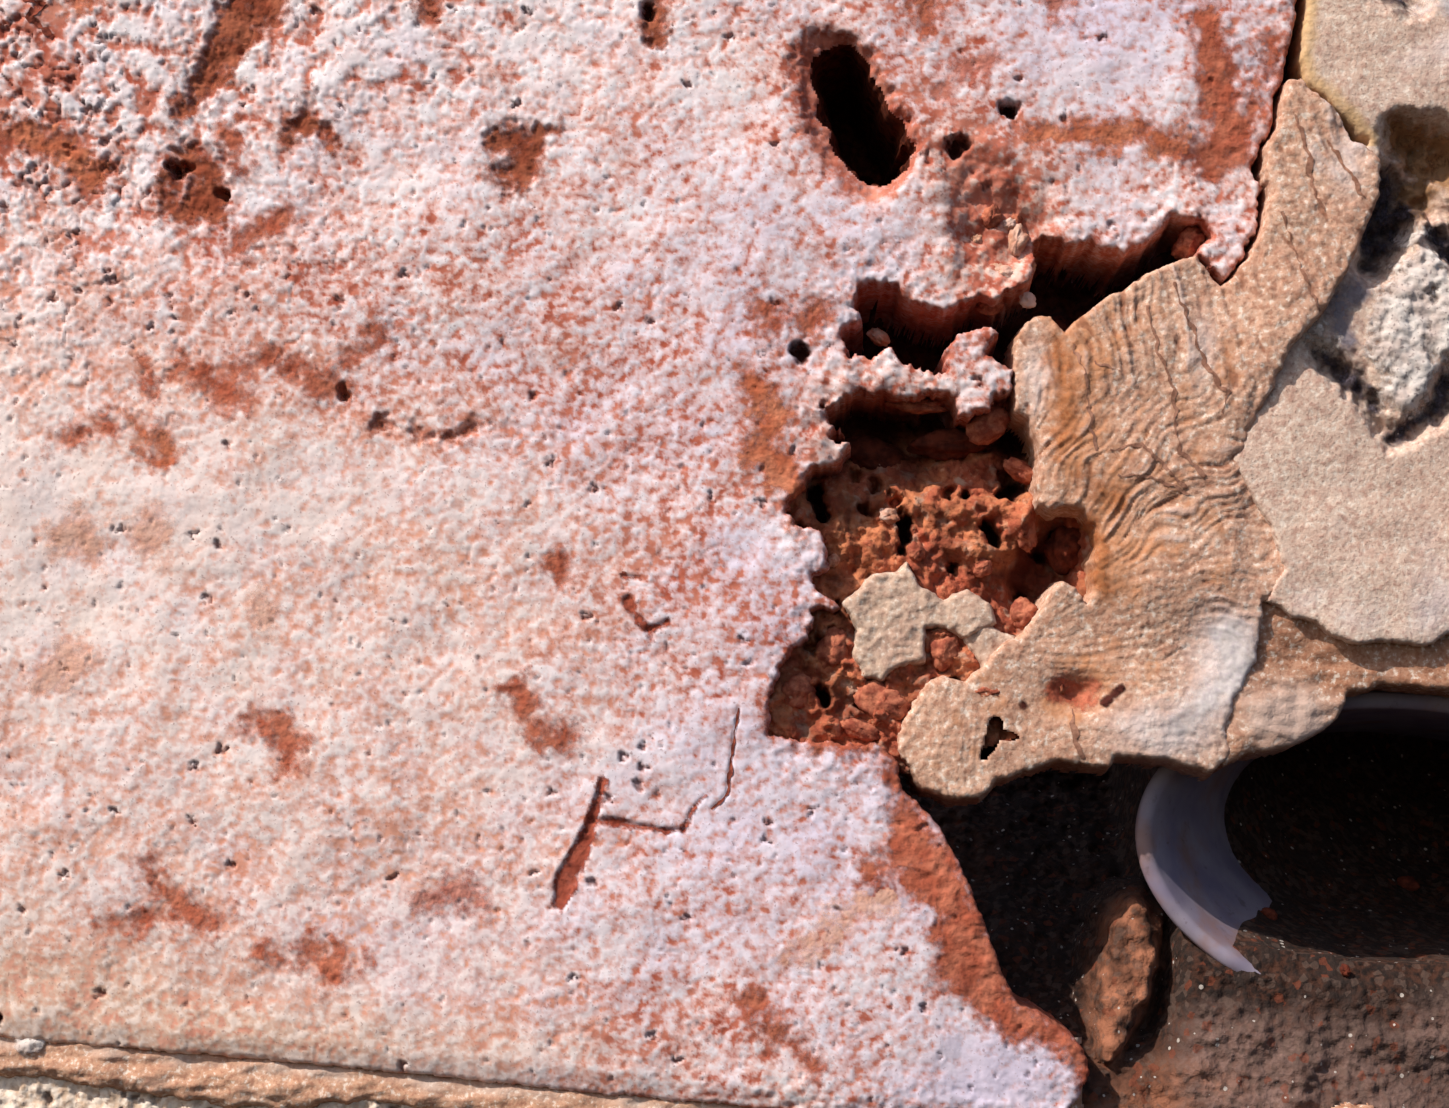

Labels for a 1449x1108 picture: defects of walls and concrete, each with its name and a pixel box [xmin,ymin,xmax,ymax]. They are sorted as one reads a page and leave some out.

water stain [1383,0,1449,13]
crack [1280,51,1366,211]
peeling [747,285,838,344]
spalling [848,204,1206,372]
crack [1072,282,1231,495]
crack [1281,211,1321,312]
water stain [1304,116,1449,446]
spalling [736,362,1091,1085]
efflorescence [1170,616,1256,734]